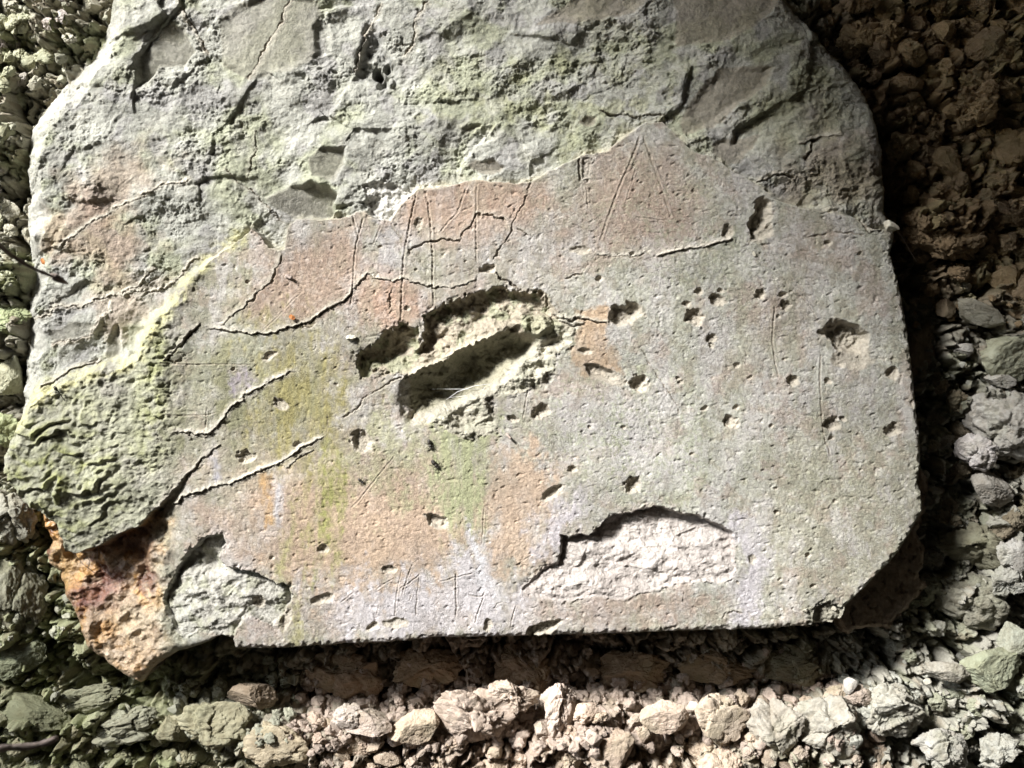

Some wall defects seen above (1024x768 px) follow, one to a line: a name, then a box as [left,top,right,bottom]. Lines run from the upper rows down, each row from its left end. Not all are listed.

crack [31,107,887,392]
crack [148,364,413,514]
spalling [406,325,535,417]
spalling [504,400,554,424]
spalling [161,531,295,640]
spalling [520,504,758,603]